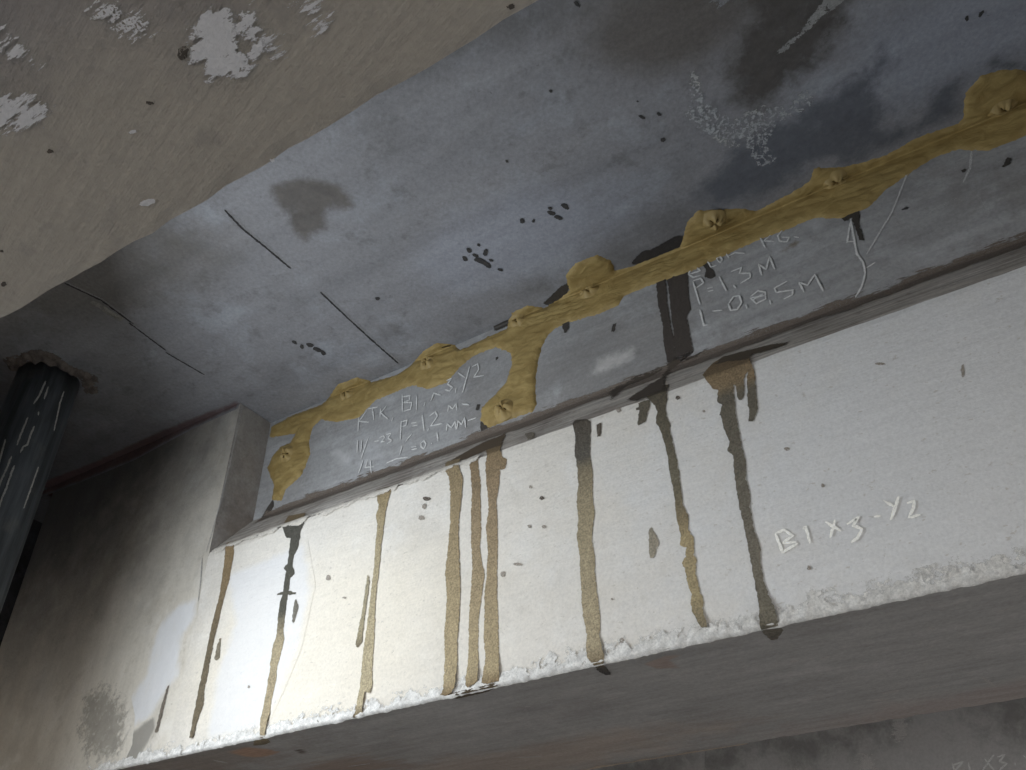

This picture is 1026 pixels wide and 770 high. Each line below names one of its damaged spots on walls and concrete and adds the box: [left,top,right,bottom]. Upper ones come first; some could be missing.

flaking render [0,24,46,70]
flaking render [84,0,162,44]
flaking render [177,0,287,83]
flaking render [288,0,334,38]
flaking render [0,92,56,136]
water stain [681,0,1026,211]
crack [224,210,293,269]
water stain [264,172,360,247]
water stain [632,236,683,265]
crack [64,282,205,375]
crack [320,291,399,363]
water stain [627,272,707,628]